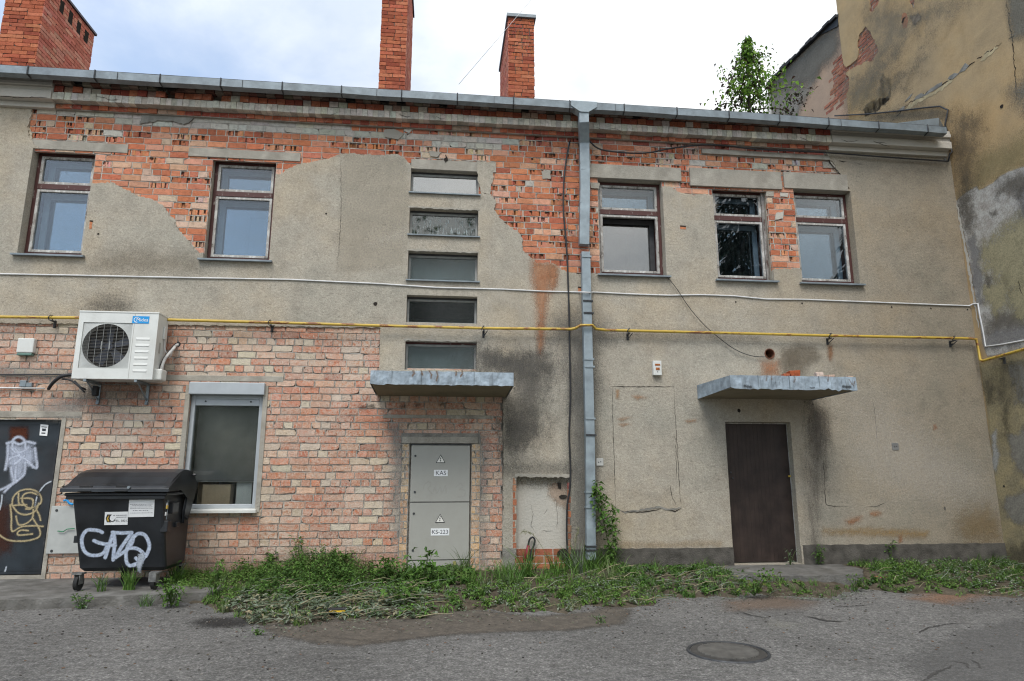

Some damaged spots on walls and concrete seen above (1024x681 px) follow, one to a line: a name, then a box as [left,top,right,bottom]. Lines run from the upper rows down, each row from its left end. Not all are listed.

peeling [824,27,878,115]
crack [896,0,1017,115]
peeling [30,109,836,291]
rust [529,259,558,356]
leakage [478,350,553,451]
leakage [516,317,603,549]
crack [612,386,681,513]
spalling [502,473,572,569]